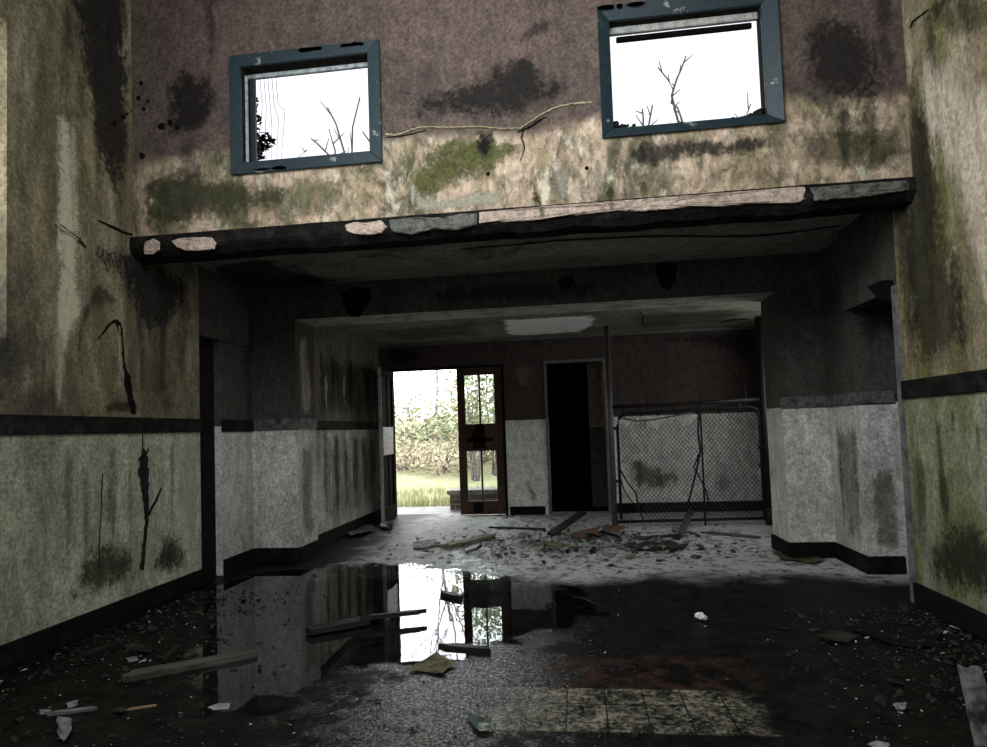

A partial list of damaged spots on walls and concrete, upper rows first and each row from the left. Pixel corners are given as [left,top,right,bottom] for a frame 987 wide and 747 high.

leakage [72,0,129,191]
leakage [167,70,213,132]
leakage [477,131,494,155]
crack [385,101,591,161]
leakage [418,59,560,116]
leakage [805,19,879,97]
spalling [144,237,217,255]
spalling [345,180,909,235]
leakage [903,89,961,355]
crack [96,319,162,570]
leakage [74,544,131,597]
leakage [933,526,987,595]